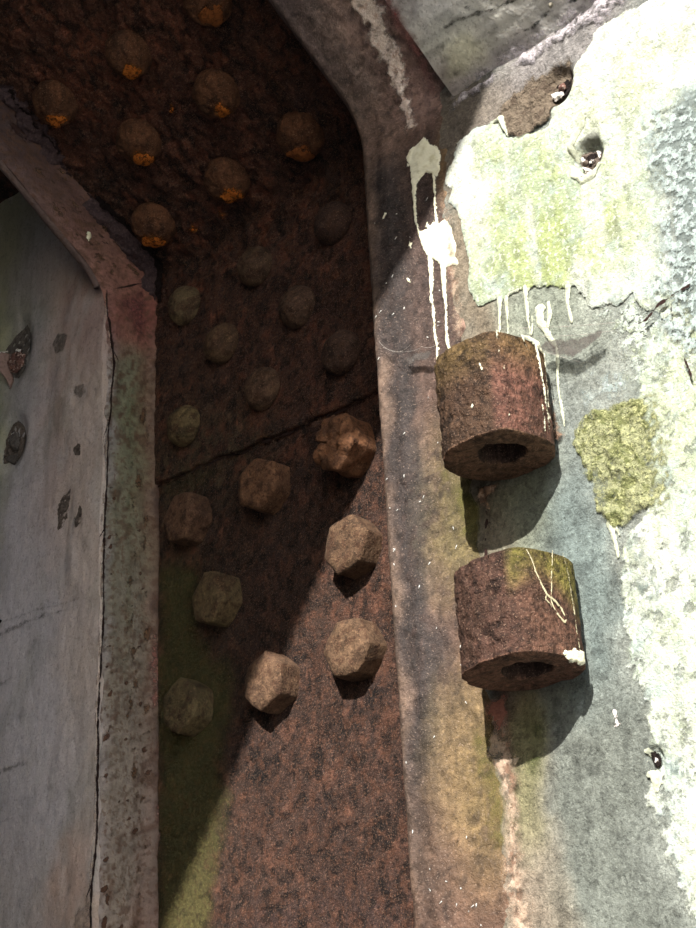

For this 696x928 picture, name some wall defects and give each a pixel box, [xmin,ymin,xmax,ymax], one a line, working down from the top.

corrosion [198,5,224,27]
corrosion [122,64,142,80]
corrosion [45,115,68,128]
corrosion [133,150,155,166]
corrosion [219,188,244,204]
corrosion [53,193,166,303]
crack [158,392,378,487]
peeling [445,0,696,928]